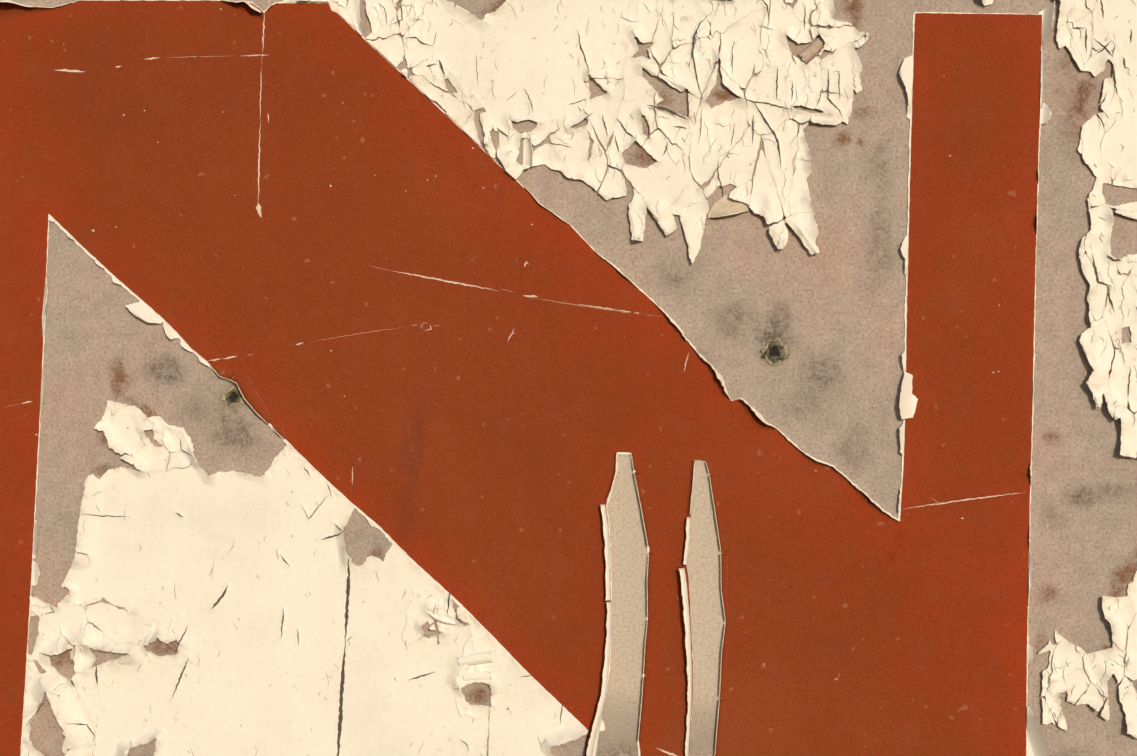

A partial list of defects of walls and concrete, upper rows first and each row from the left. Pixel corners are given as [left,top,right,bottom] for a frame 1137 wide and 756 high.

peeling [283,0,869,263]
crack [569,99,635,151]
crack [649,14,734,155]
crack [717,56,796,197]
crack [827,70,842,115]
peeling [1039,0,1137,458]
peeling [125,300,210,367]
peeling [21,400,605,756]
crack [302,467,353,756]
peeling [1027,571,1137,756]